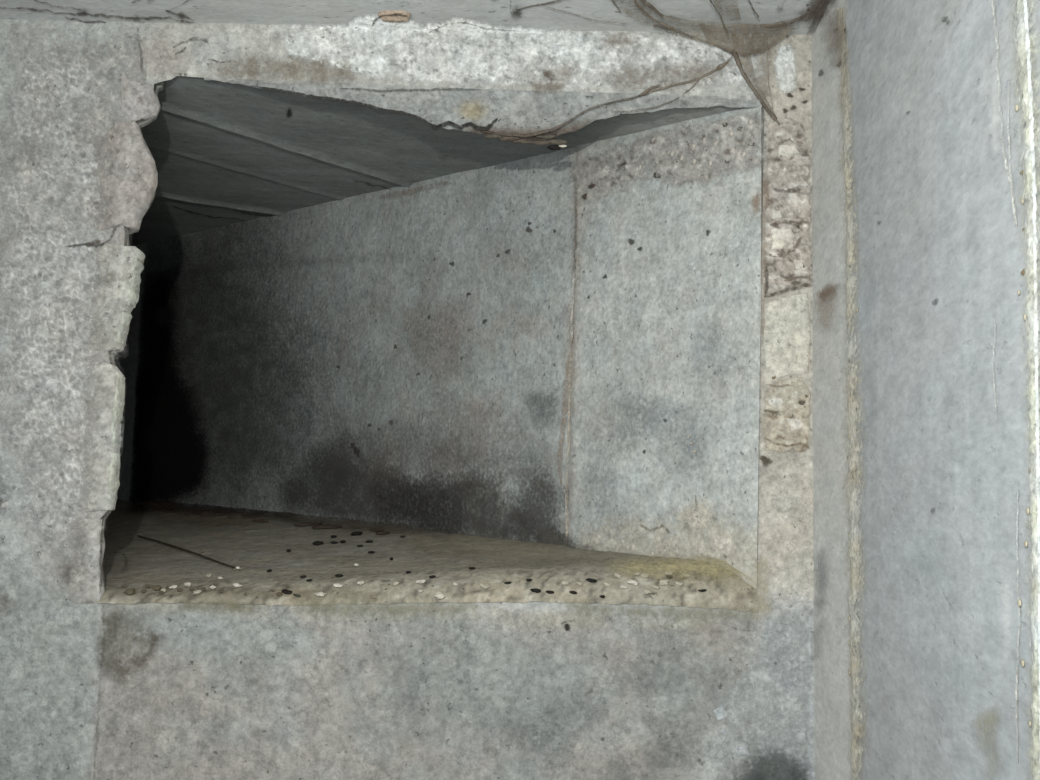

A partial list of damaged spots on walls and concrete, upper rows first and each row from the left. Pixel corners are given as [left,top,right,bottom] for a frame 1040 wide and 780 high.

crack [0,0,237,68]
crack [802,0,842,60]
flaking render [0,33,161,604]
damp [277,436,585,548]
damp [743,754,806,780]